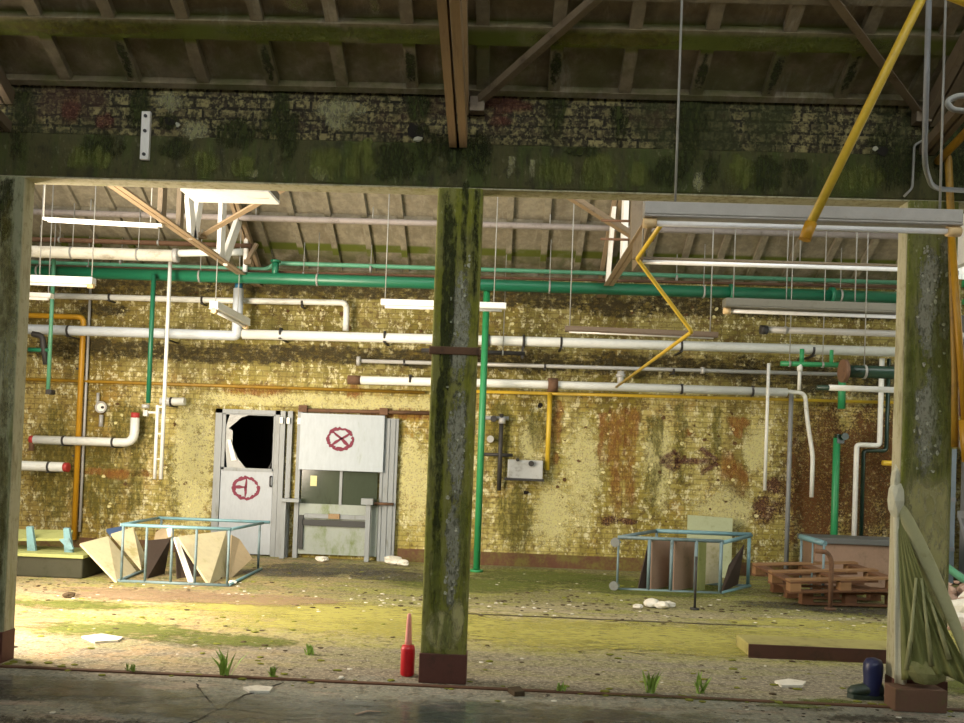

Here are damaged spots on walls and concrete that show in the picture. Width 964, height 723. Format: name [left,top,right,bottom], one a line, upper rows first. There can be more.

water stain [262,91,299,163]
water stain [530,98,617,191]
water stain [630,101,752,190]
water stain [0,438,8,543]
water stain [0,178,17,426]
water stain [28,181,895,655]
corrosion [597,409,640,510]
water stain [905,329,916,447]
water stain [931,246,950,449]
crack [189,682,284,723]
water stain [0,676,730,723]